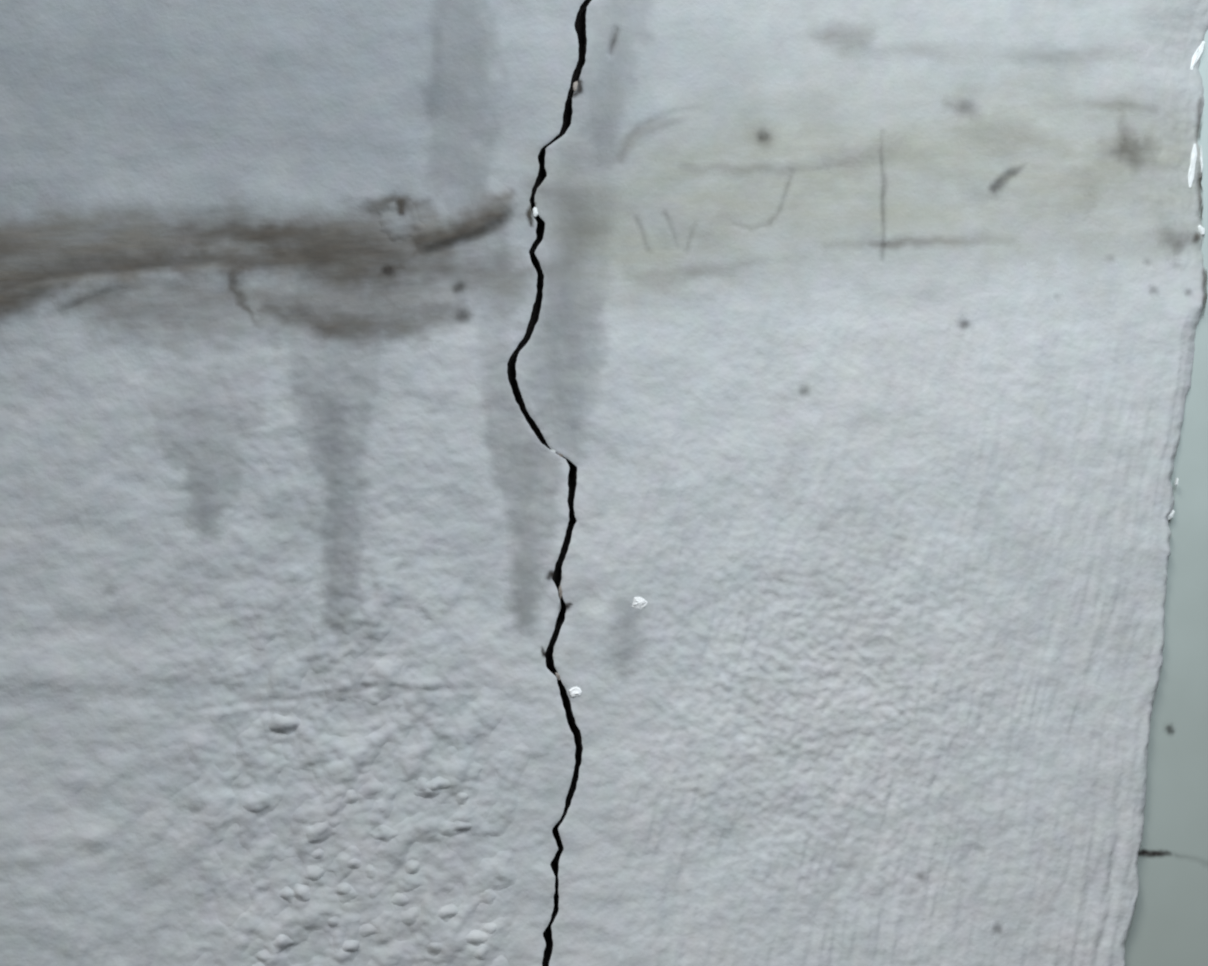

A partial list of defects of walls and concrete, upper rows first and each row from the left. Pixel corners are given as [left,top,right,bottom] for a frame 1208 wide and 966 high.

crack [507,0,592,966]